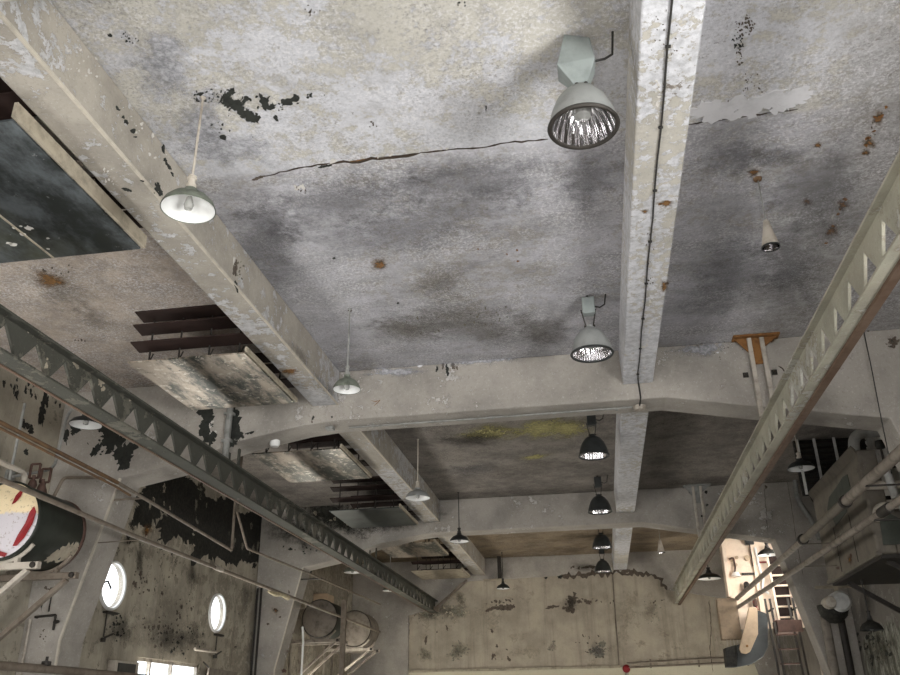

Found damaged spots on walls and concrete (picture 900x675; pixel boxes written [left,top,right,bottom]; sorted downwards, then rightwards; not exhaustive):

peeling [689,14,813,124]
peeling [143,37,312,162]
corrosion [862,106,888,155]
crack [252,139,548,181]
peeling [63,426,81,445]
peeling [87,425,139,471]
peeling [196,409,217,446]
peeling [230,407,254,447]
peeling [131,476,262,568]
spalling [485,598,515,612]
spalling [545,592,614,614]